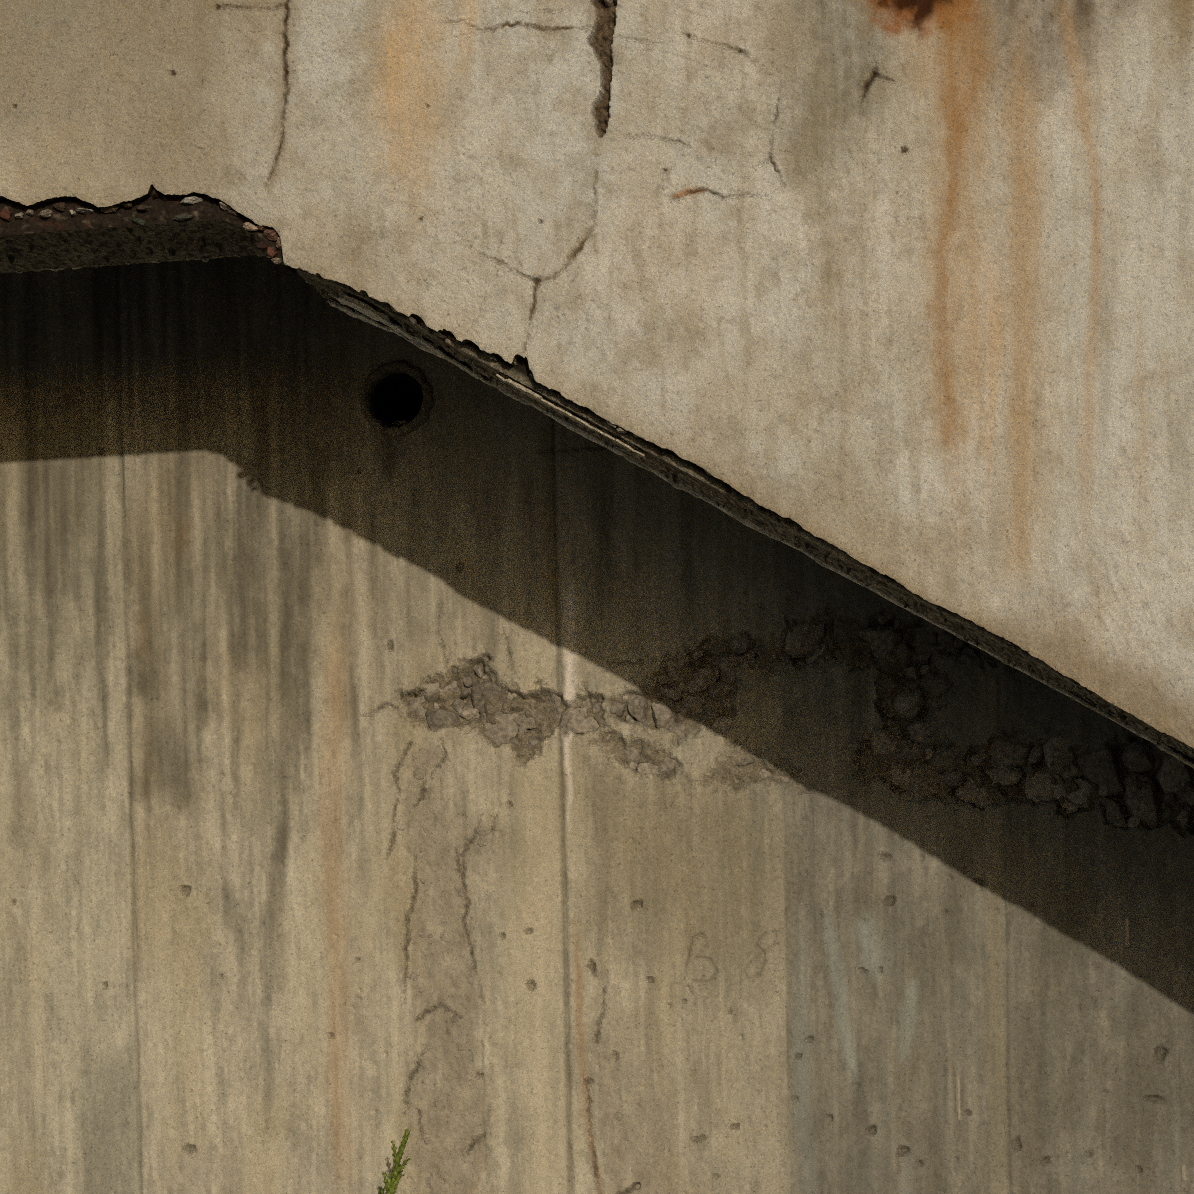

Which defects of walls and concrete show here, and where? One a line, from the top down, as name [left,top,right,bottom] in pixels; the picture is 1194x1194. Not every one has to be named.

crack [213,0,292,191]
crack [439,0,789,203]
crack [858,57,897,105]
crack [453,166,599,356]
corrosion [832,0,1108,597]
spalling [0,184,1025,651]
damp [0,166,446,1194]
damp [471,445,541,675]
damp [561,457,622,700]
damp [670,484,713,612]
peeling [1041,660,1194,769]
crack [585,1086,641,1194]